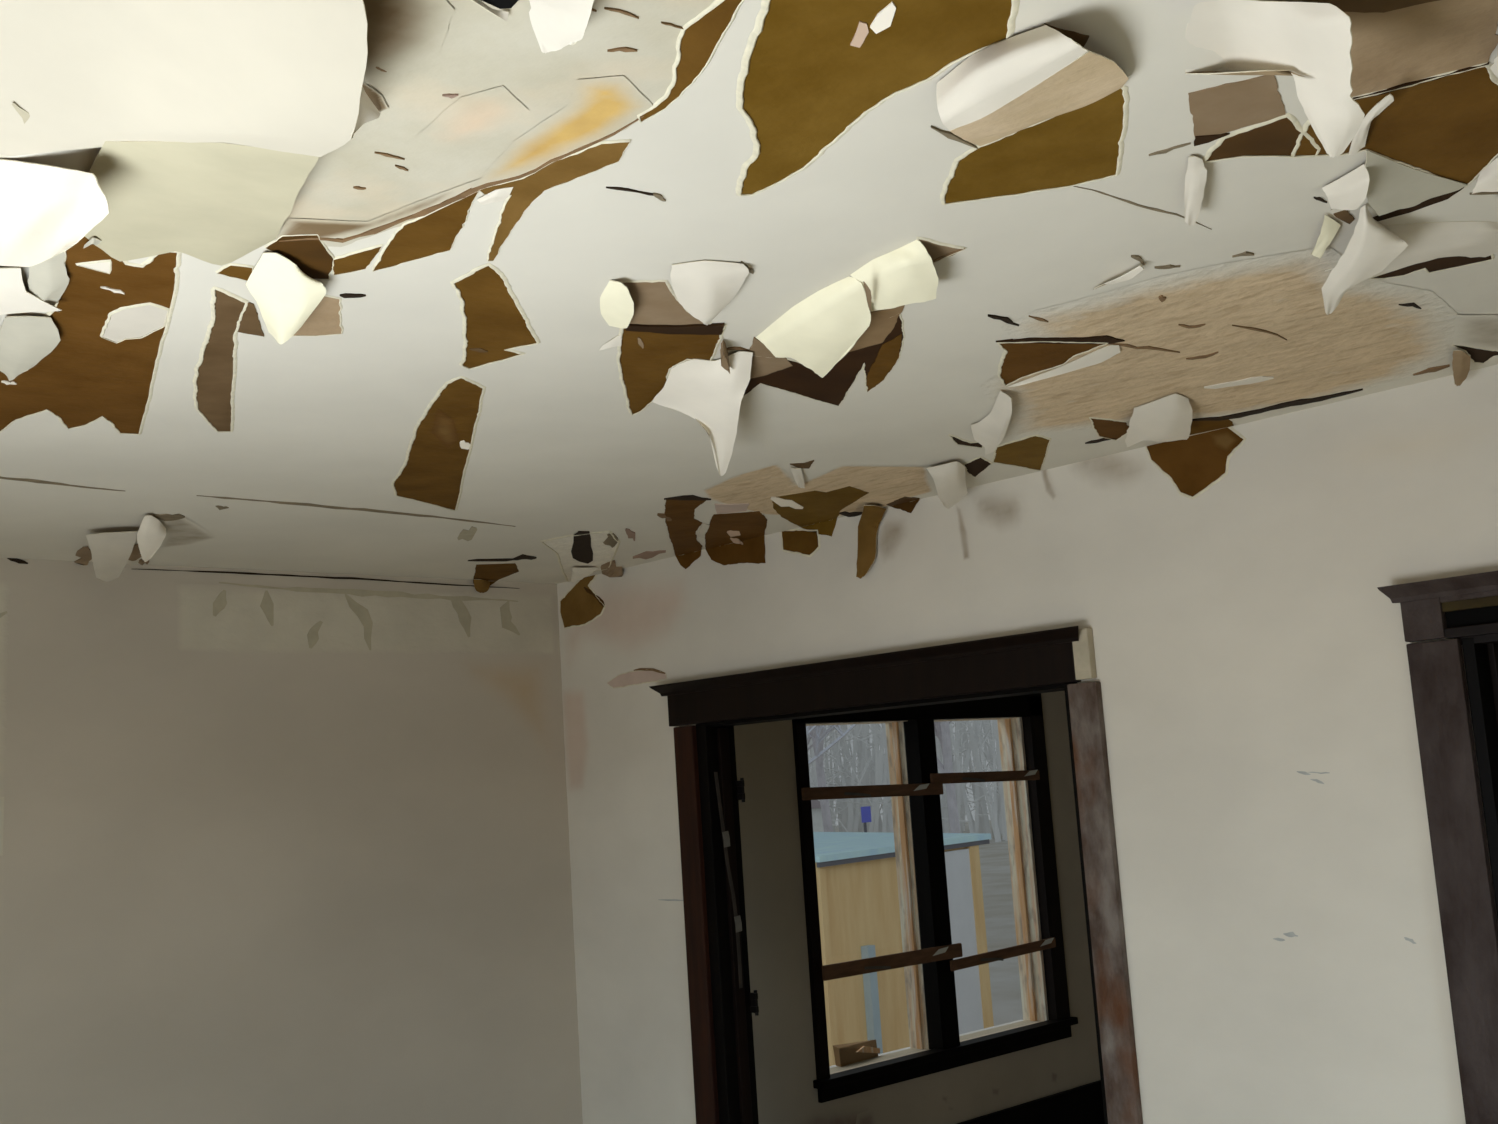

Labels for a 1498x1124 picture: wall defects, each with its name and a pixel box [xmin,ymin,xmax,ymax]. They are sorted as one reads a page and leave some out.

peeling [1452,350,1471,386]
spalling [540,528,666,582]